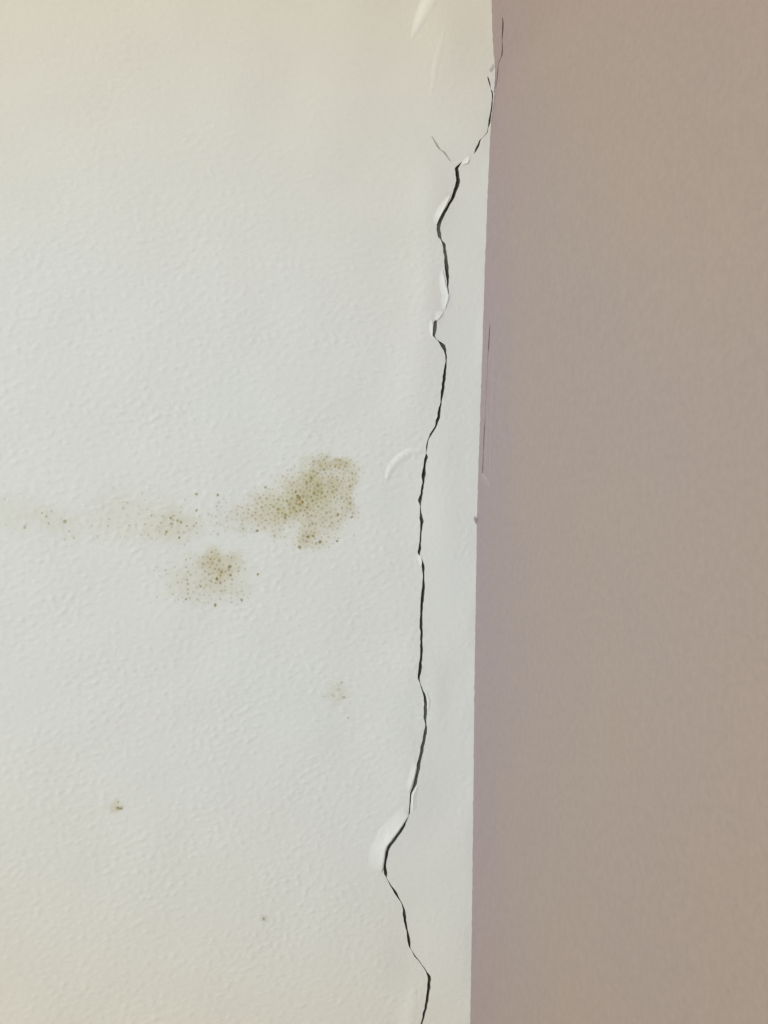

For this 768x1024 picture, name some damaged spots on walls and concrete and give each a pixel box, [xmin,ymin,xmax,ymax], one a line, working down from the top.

crack [368,18,504,1024]